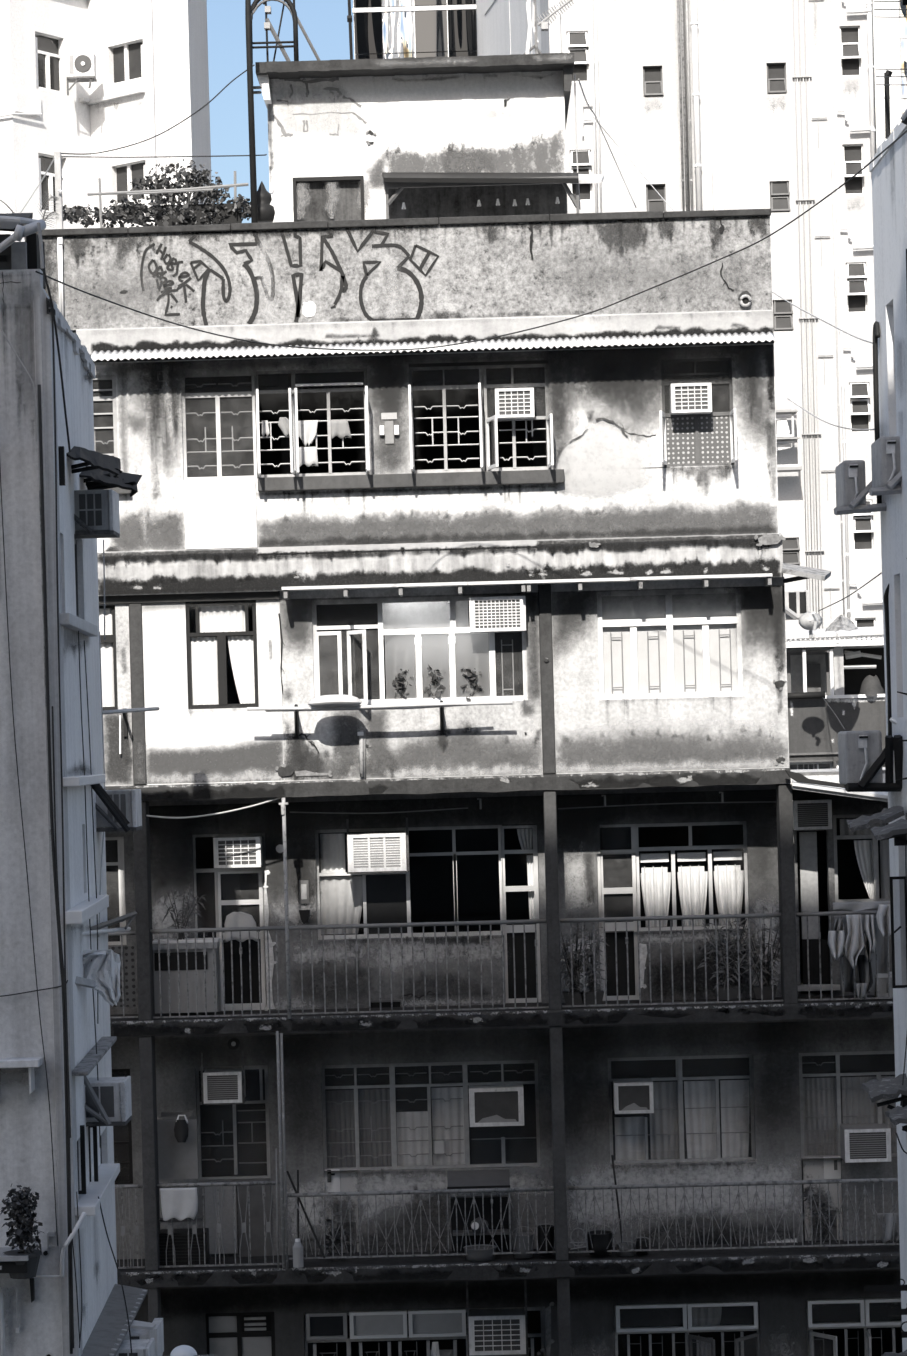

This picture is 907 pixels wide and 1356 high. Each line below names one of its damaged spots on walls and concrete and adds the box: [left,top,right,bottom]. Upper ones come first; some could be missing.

leakage [359,134,564,205]
leakage [464,219,674,254]
leakage [710,220,721,247]
leakage [749,216,767,236]
leakage [122,365,176,469]
crack [569,418,670,468]
leakage [344,485,553,495]
leakage [97,504,780,595]
leakage [558,731,787,783]